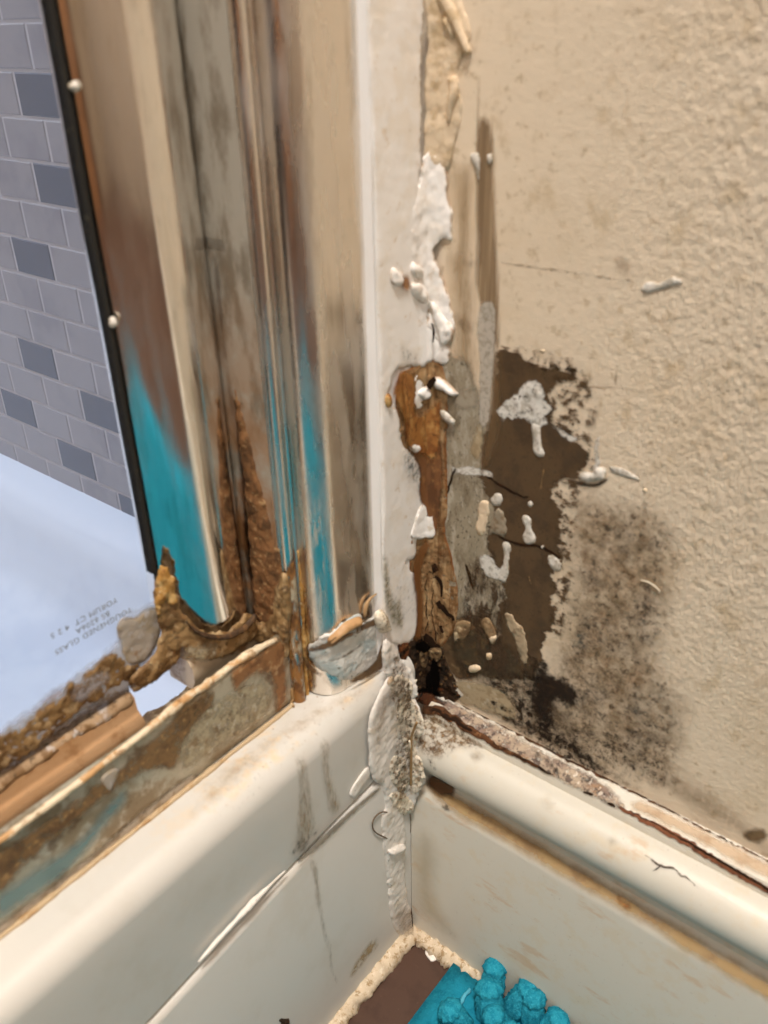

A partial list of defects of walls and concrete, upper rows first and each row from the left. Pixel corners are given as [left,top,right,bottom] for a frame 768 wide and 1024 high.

peeling [366,0,596,681]
rust [0,693,214,891]
rust [231,390,309,711]
damp [389,511,768,876]
crack [422,705,768,894]